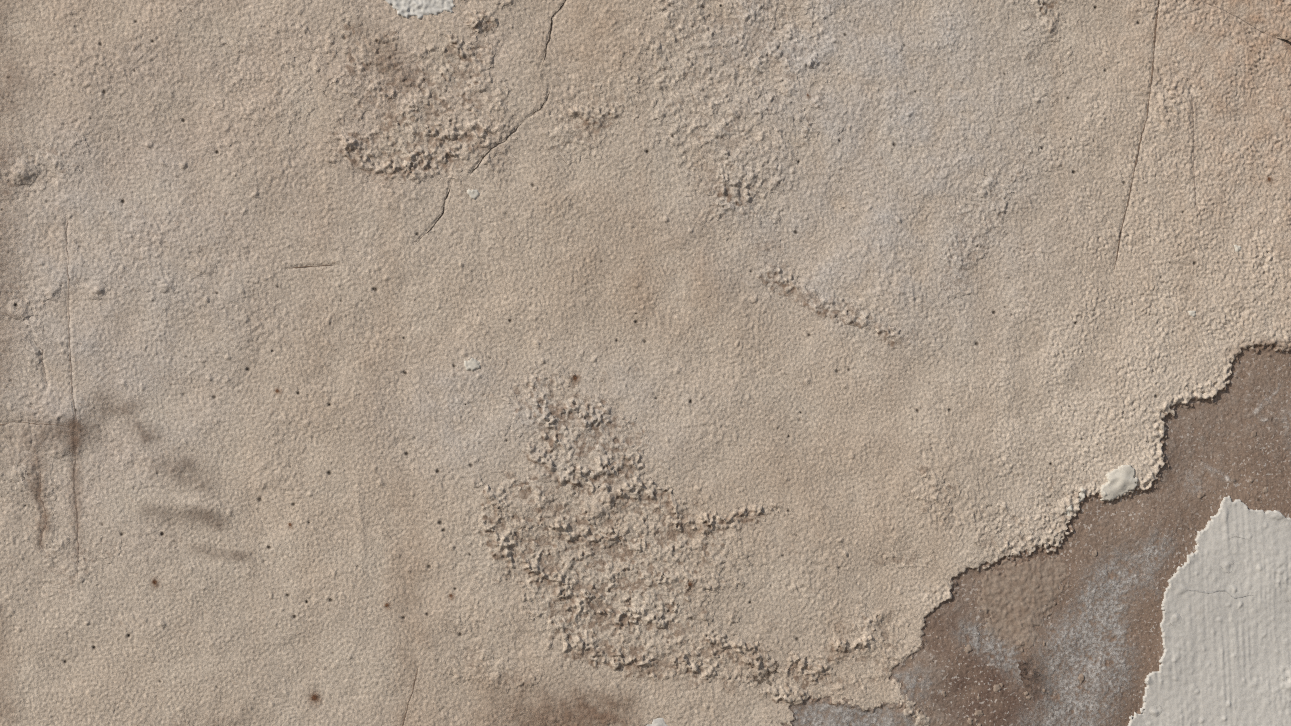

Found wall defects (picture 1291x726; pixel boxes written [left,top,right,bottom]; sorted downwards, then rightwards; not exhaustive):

spalling [201,0,517,200]
crack [419,0,566,240]
crack [1113,0,1159,272]
spalling [472,341,1291,726]